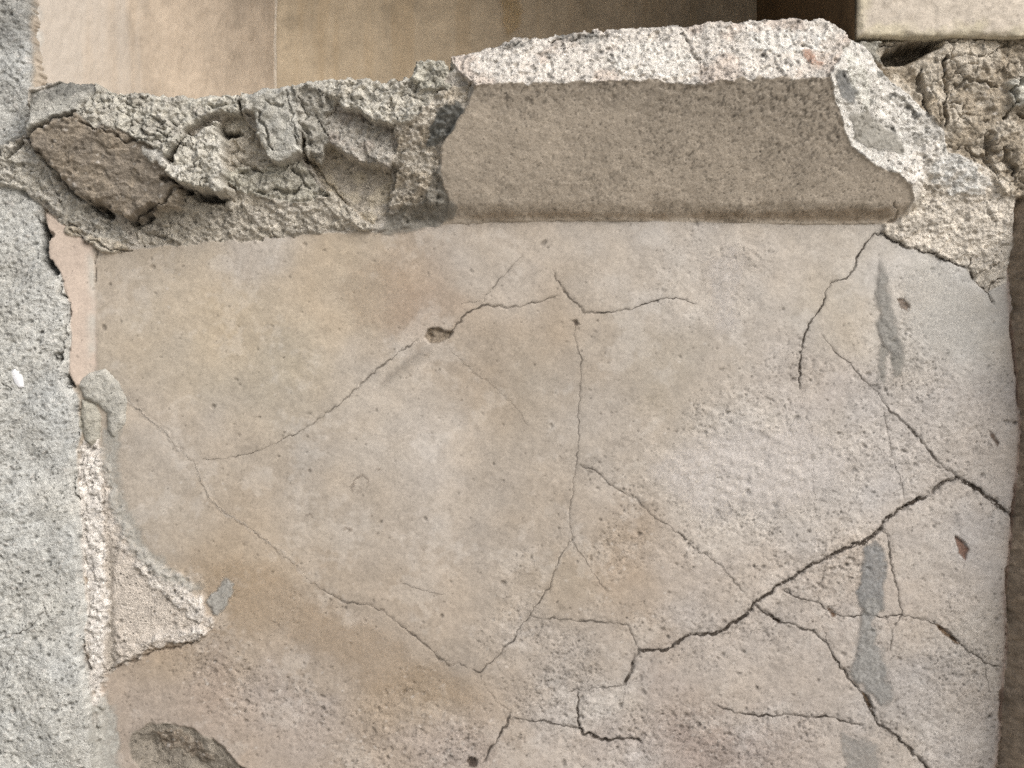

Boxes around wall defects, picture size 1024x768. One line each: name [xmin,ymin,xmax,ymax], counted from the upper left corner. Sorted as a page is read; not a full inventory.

flaking render [451,18,1017,293]
crack [598,297,692,313]
crack [798,233,1000,385]
flaking render [77,438,215,738]
crack [488,351,1008,768]
spalling [129,722,244,768]